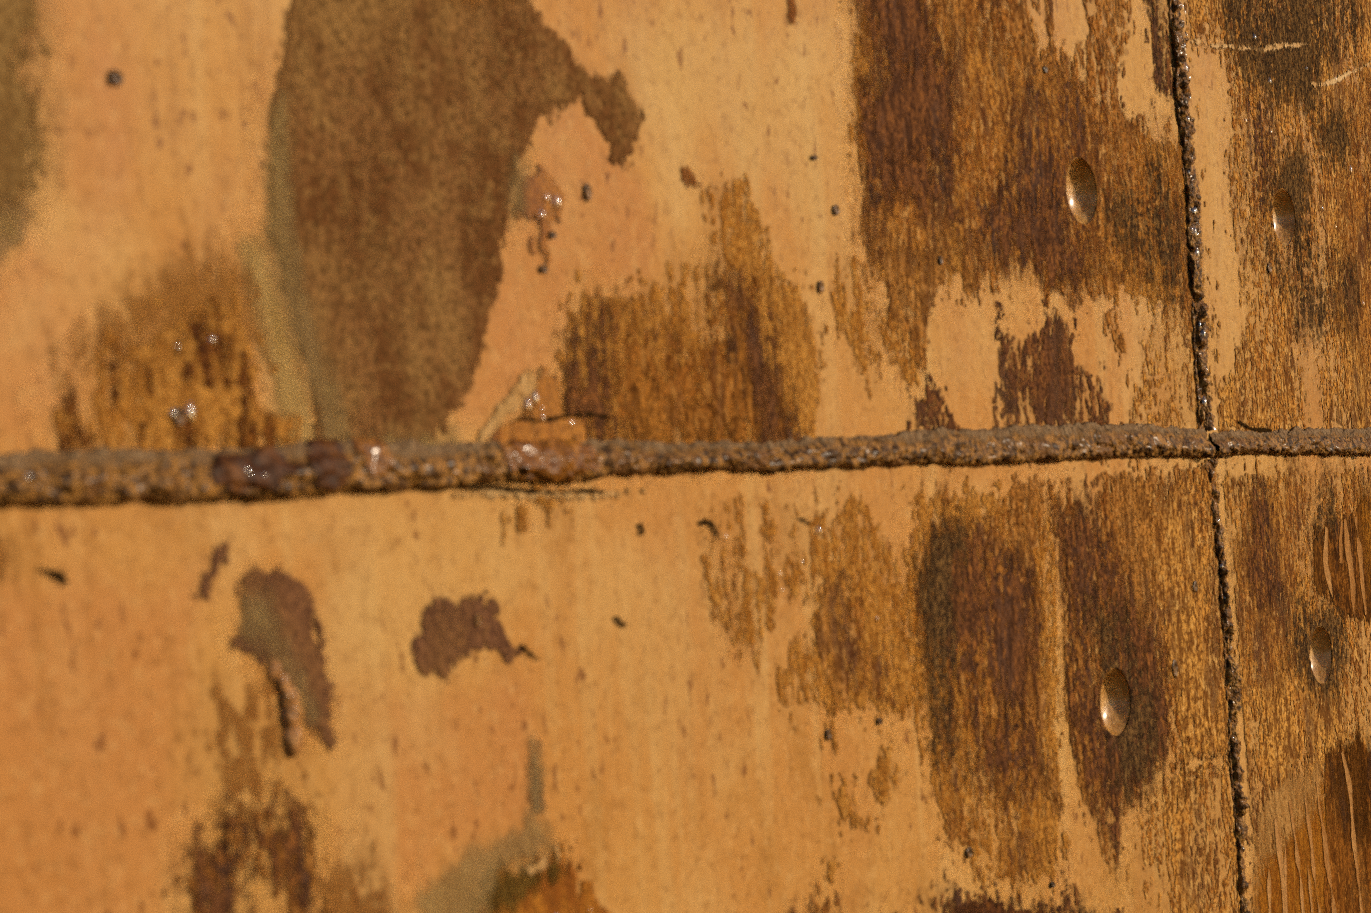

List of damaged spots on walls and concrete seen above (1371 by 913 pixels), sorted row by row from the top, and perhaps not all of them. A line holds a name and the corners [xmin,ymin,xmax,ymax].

damp [0,0,52,259]
rust [51,245,395,493]
damp [239,0,646,445]
rust [492,0,1371,546]
rust [701,453,1371,913]